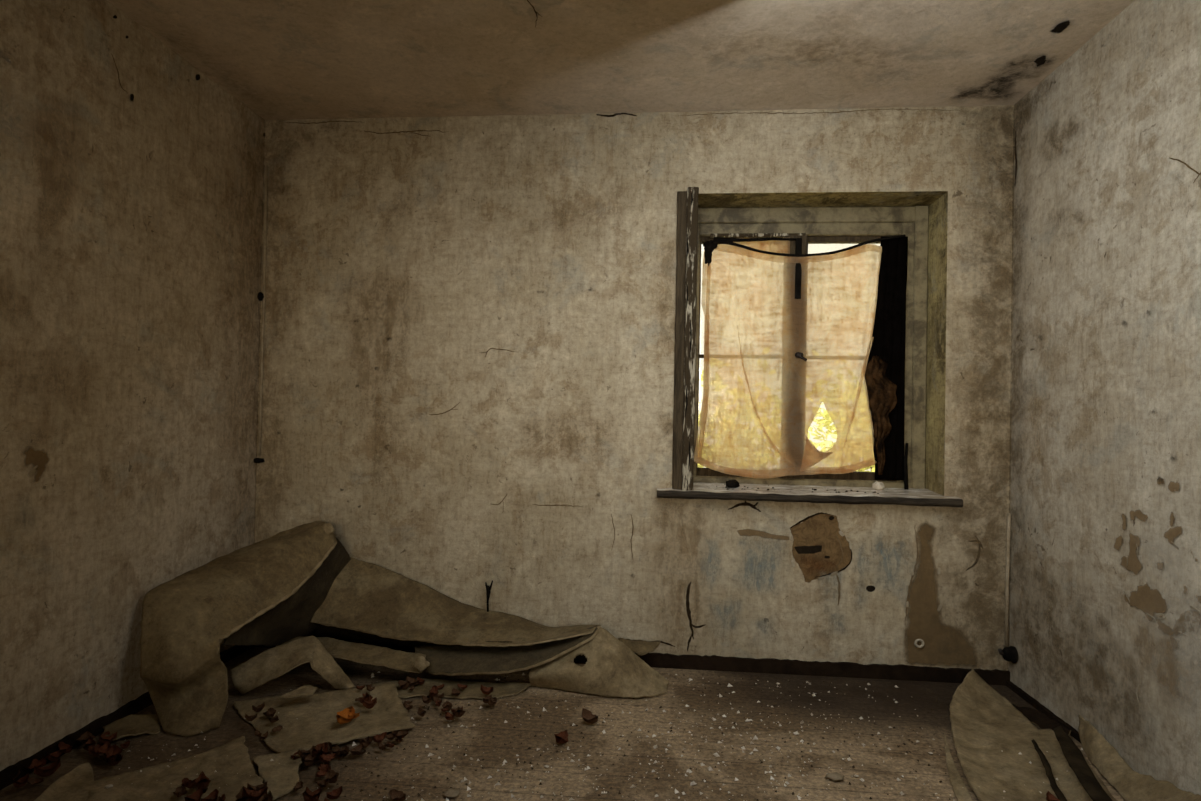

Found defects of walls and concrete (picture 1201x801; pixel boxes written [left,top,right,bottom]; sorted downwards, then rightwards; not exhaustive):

leakage [1050,20,1070,33]
leakage [943,55,1138,722]
peeling [1157,477,1179,492]
spalling [737,512,861,583]
peeling [1114,510,1201,650]
crack [656,582,706,651]